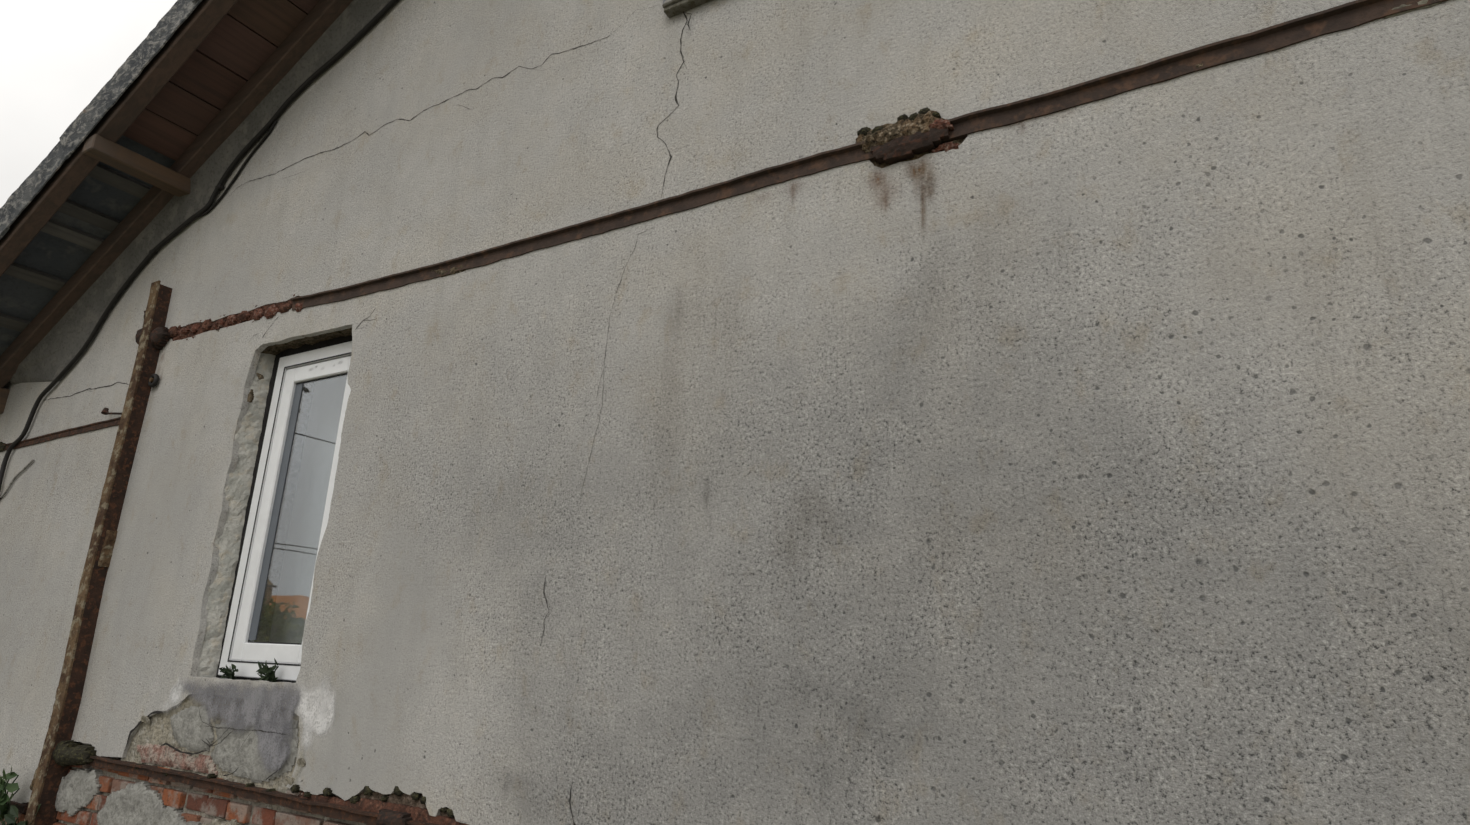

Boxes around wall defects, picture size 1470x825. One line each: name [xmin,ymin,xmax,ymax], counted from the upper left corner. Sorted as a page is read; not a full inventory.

crack [231,25,621,194]
crack [657,12,692,196]
spalling [856,107,966,168]
spalling [121,695,306,793]
spalling [336,786,455,818]